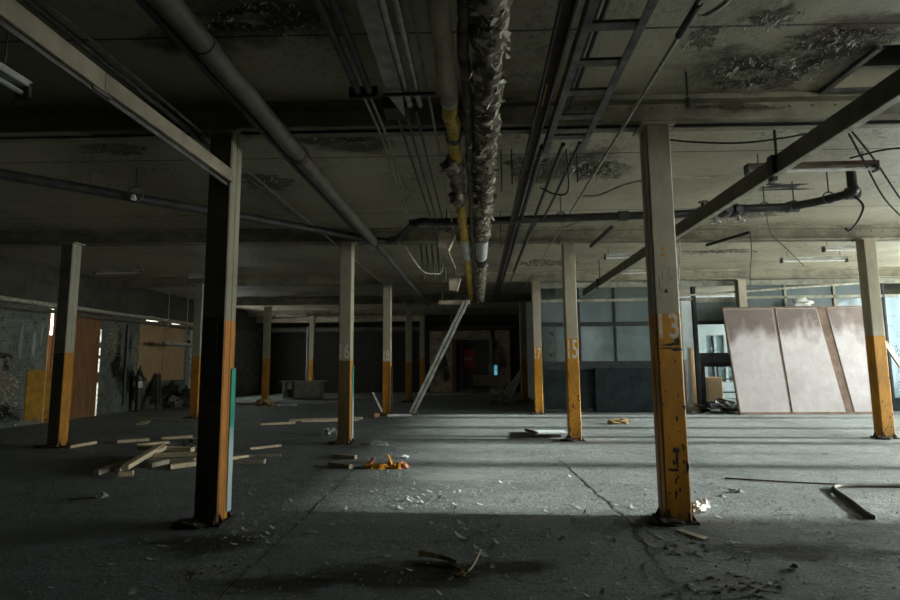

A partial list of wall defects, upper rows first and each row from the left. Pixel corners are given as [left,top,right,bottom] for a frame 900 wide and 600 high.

peeling [680,0,899,95]
peeling [456,0,638,306]
peeling [660,338,682,362]
peeling [668,437,689,499]
crack [549,438,695,600]